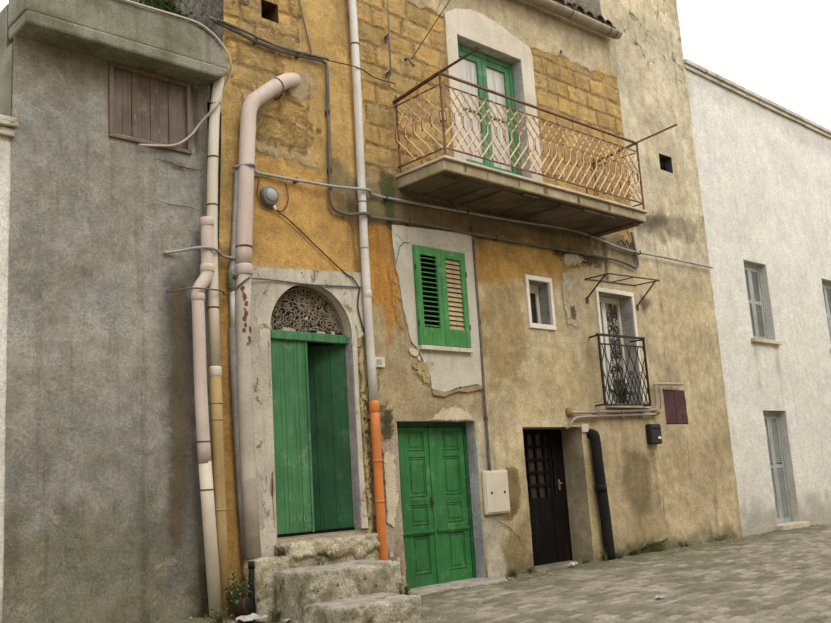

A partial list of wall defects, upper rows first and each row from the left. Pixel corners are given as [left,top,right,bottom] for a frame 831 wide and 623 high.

rust [240,285,251,345]
flaking render [391,225,483,397]
damp [379,401,398,497]
flaking render [426,405,474,422]